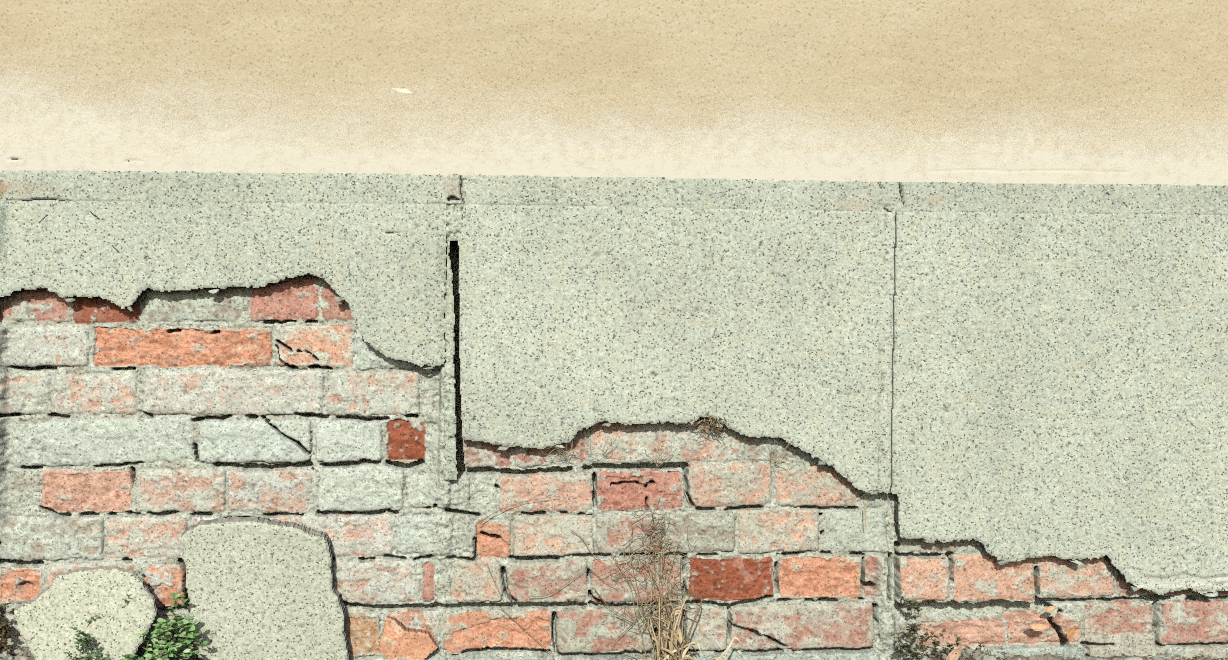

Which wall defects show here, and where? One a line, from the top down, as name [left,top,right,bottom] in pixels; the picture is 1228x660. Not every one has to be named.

spalling [94,327,270,369]
spalling [388,419,427,461]
spalling [44,472,131,513]
spalling [599,474,681,512]
spalling [886,493,906,539]
spalling [477,531,511,559]
spalling [0,568,41,605]
spalling [151,583,189,607]
spalling [689,557,861,600]
spalling [1105,555,1154,593]
spalling [927,610,1081,649]